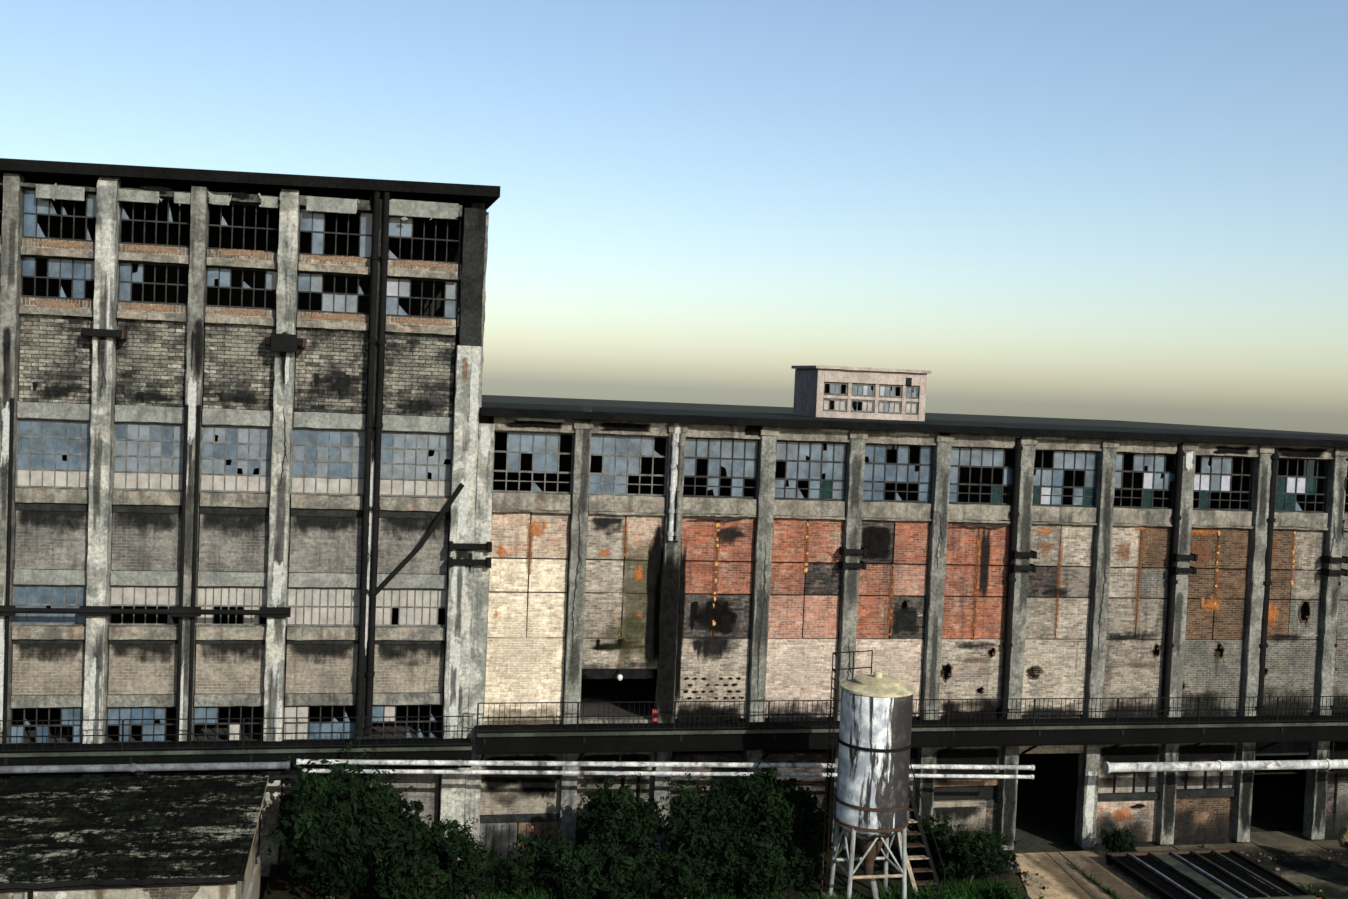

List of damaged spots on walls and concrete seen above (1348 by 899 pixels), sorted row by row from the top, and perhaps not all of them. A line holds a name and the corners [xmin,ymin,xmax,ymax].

corrosion [530,521,546,536]
damp [719,527,744,544]
corrosion [1193,530,1220,610]
spalling [1298,599,1311,624]
damp [680,601,729,670]
spalling [940,663,953,683]